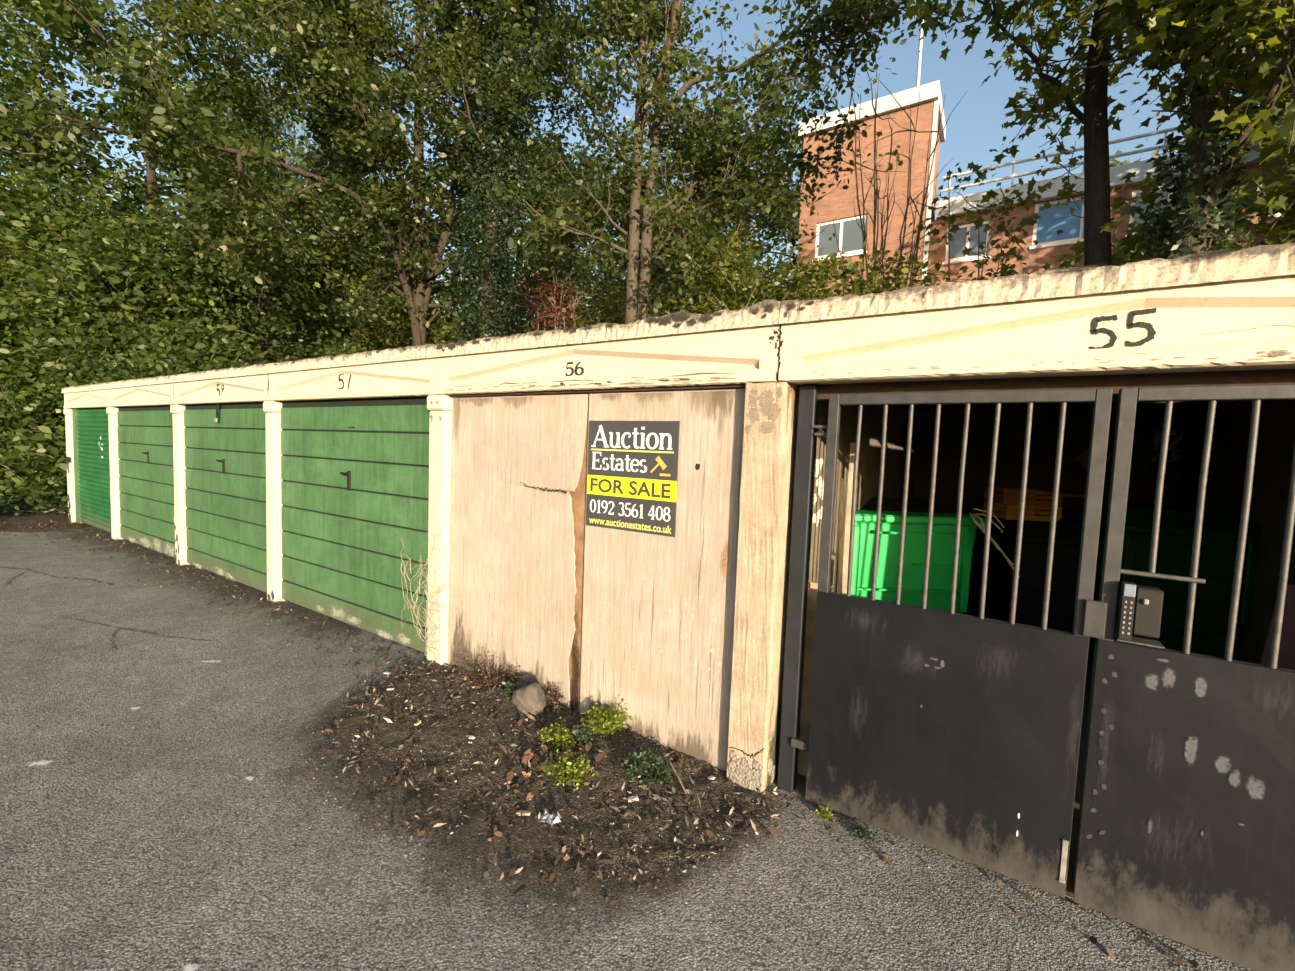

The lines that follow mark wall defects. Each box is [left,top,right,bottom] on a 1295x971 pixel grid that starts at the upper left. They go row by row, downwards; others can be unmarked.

crack [305,326,783,416]
peeling [1248,350,1295,360]
crack [497,453,567,499]